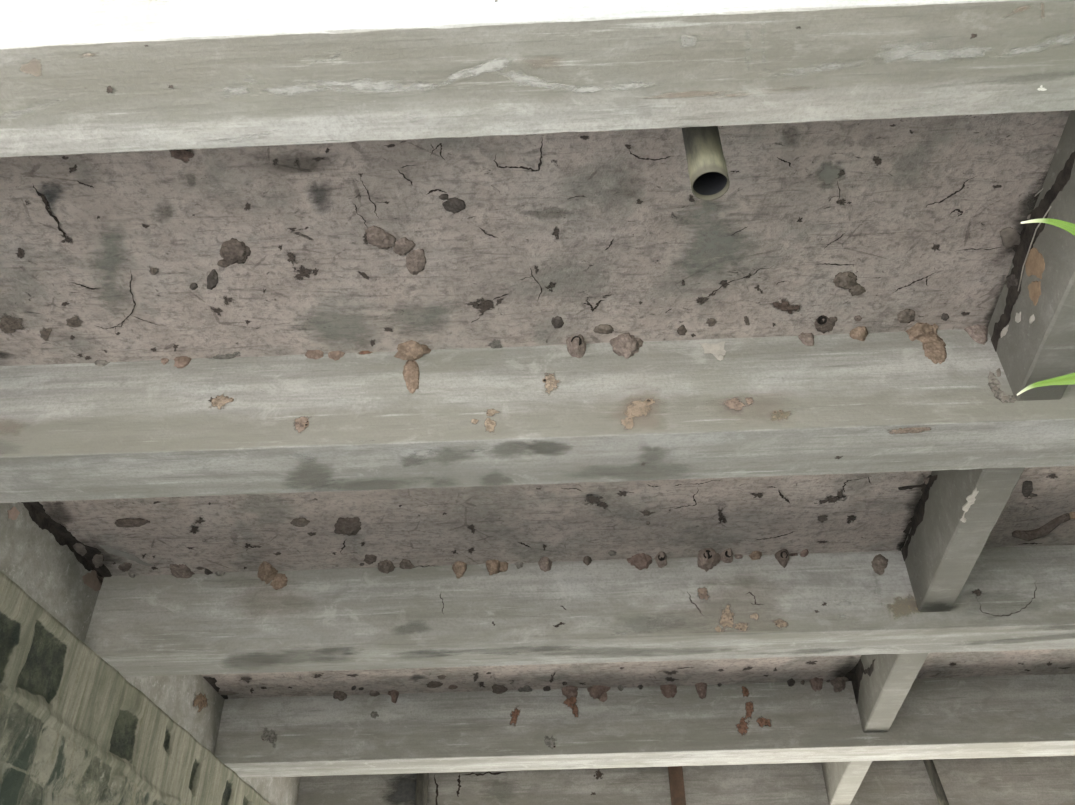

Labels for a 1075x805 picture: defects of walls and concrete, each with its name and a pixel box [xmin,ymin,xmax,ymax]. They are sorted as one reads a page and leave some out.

crack [494,138,543,172]
crack [629,150,671,161]
crack [32,183,69,243]
crack [699,265,785,304]
crack [97,274,151,330]
spalling [17,502,116,591]
crack [976,587,1037,616]
damp [231,648,343,666]
damp [384,773,417,805]